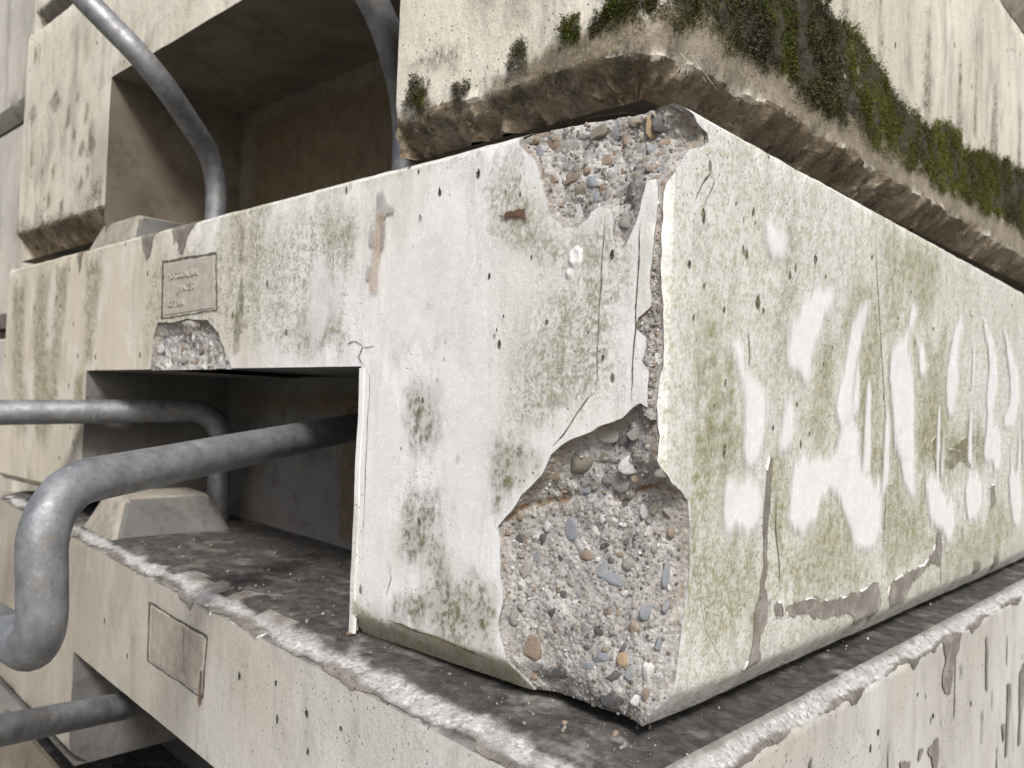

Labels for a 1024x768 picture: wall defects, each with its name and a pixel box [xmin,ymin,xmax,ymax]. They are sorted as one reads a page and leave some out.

rust [366,191,394,291]
rust [498,208,526,221]
spalling [152,319,235,371]
crack [554,223,605,444]
spalling [500,105,704,724]
peeling [742,456,943,673]
peeling [818,586,1024,744]
peeling [720,716,795,768]
peeling [887,737,939,768]
peeling [996,666,1024,768]